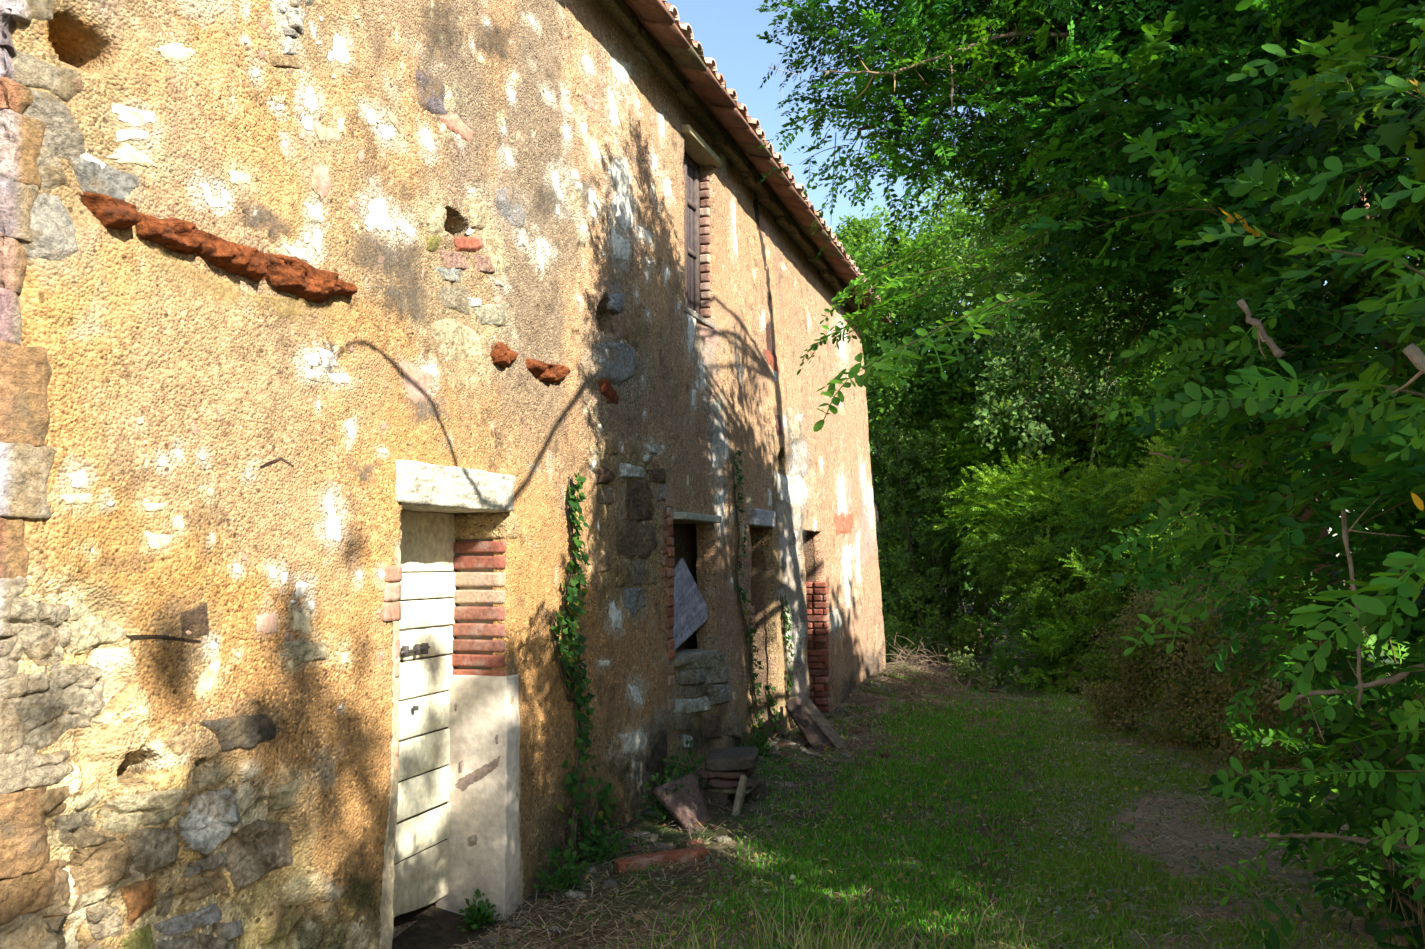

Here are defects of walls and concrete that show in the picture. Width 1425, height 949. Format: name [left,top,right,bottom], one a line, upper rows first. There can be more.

peeling [500,72,521,168]
spalling [543,51,685,632]
crack [753,198,782,436]
peeling [145,448,181,469]
peeling [255,566,351,670]
peeling [353,557,385,581]
spalling [9,596,300,949]